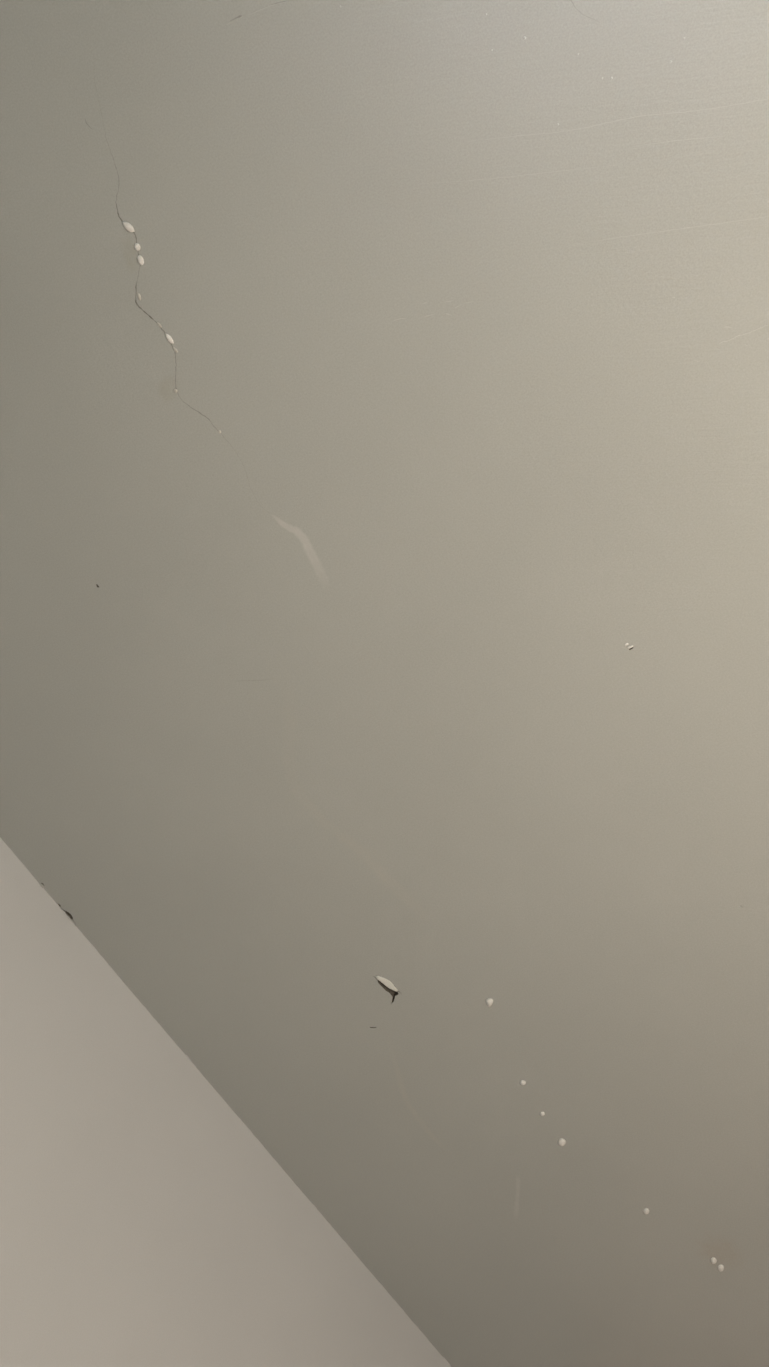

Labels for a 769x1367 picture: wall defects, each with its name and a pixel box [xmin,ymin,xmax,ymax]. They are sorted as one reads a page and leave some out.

crack [85,56,271,514]
peeling [373,976,402,1005]